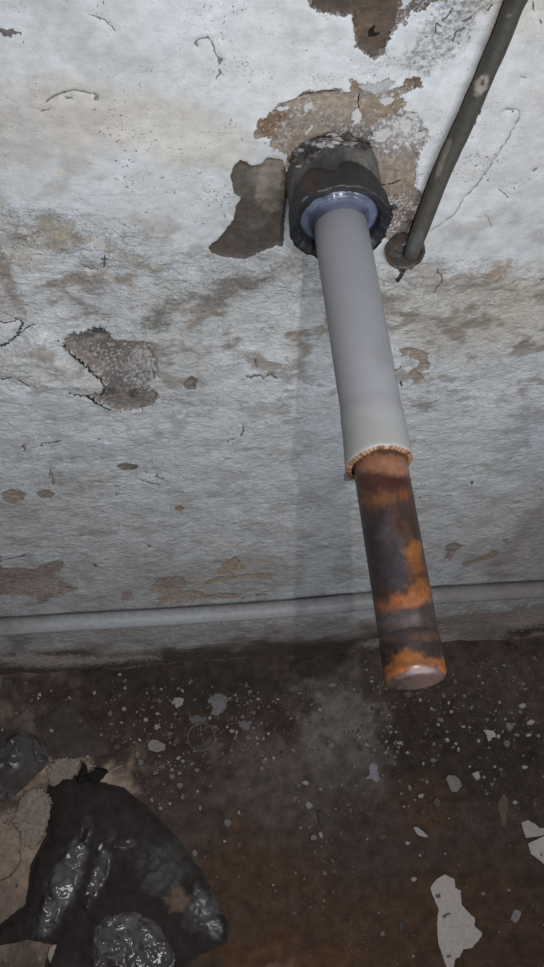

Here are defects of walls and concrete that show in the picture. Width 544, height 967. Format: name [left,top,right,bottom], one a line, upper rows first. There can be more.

peeling [308,0,438,61]
peeling [209,76,431,259]
crack [0,319,36,347]
flaking render [57,325,160,412]